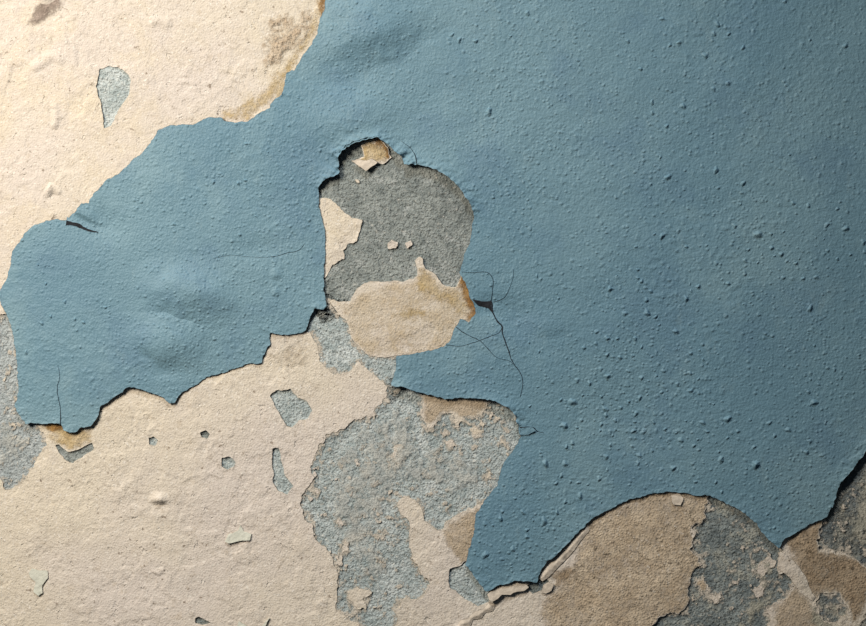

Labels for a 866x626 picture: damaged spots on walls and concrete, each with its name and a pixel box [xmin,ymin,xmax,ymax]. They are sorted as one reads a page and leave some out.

spalling [96,66,131,128]
peeling [0,314,94,490]
spalling [271,389,312,427]
peeling [300,137,521,626]
crack [446,270,523,396]
peeling [671,493,683,505]
peeling [653,496,792,626]
peeling [816,592,849,622]
peeling [817,452,866,567]